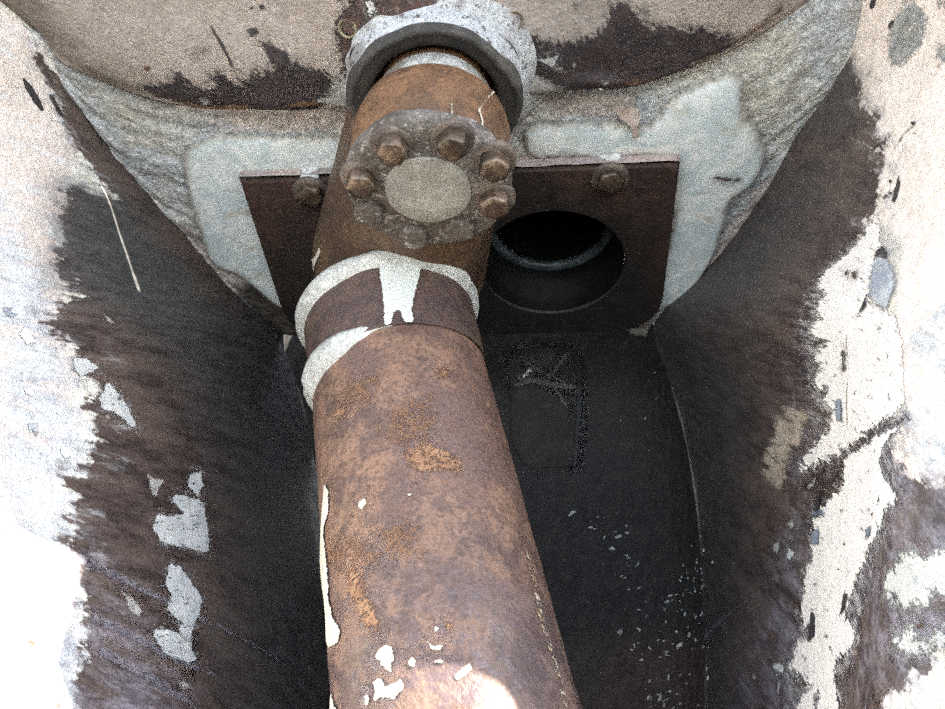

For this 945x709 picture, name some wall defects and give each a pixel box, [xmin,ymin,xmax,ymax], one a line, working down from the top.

corrosion [677,0,785,73]
corrosion [151,91,253,110]
peeling [889,176,900,203]
peeling [73,358,98,376]
peeling [98,383,136,428]
corrosion [403,442,462,473]
peeling [762,211,909,709]
peeling [153,471,209,553]
peeling [153,563,203,664]
corrosion [346,565,380,631]
peeling [883,547,945,657]
peeling [364,644,404,705]